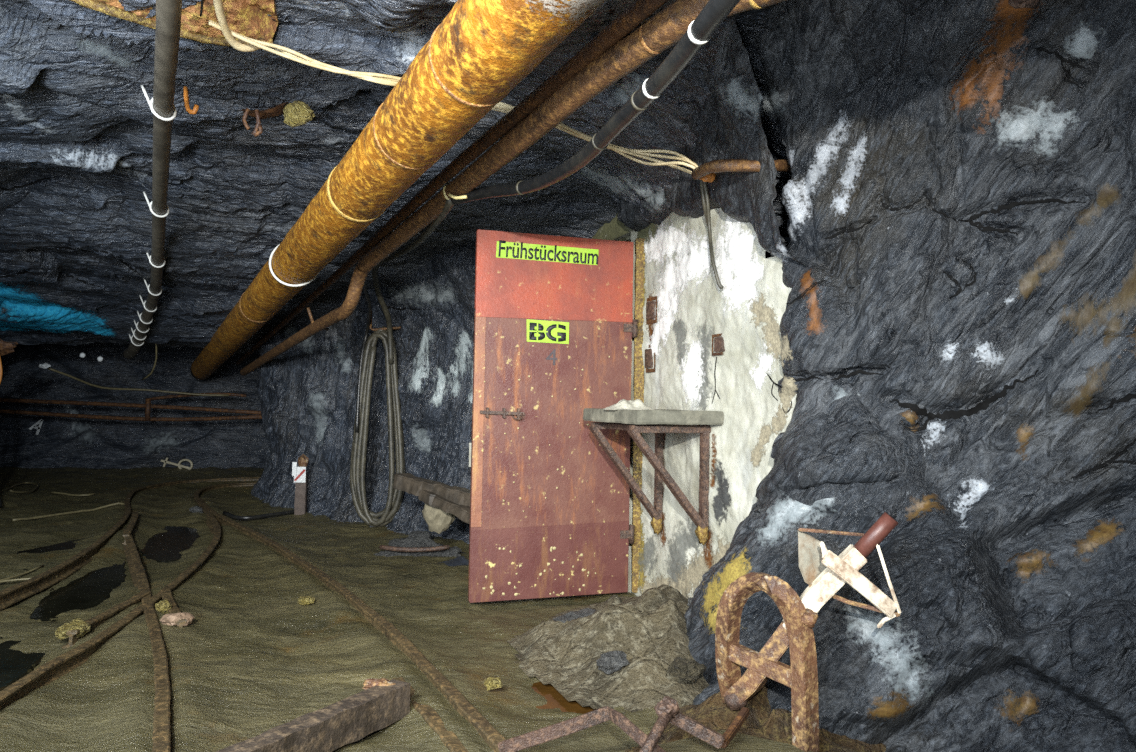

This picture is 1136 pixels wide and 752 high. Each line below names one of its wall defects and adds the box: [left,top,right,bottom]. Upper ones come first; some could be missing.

damp [726,80,782,117]
damp [582,110,867,411]
damp [758,498,836,542]
damp [848,608,933,717]